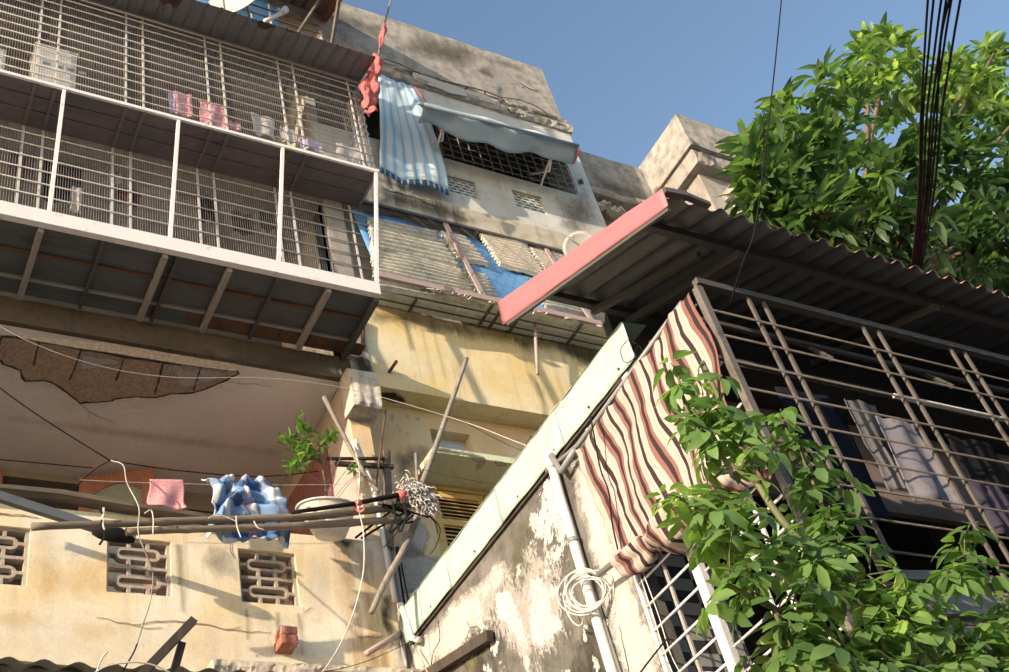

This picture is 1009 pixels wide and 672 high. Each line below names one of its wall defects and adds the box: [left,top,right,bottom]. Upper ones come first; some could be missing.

water stain [415,40,468,59]
flaking render [0,335,240,404]
peeling [470,479,568,672]
water stain [382,597,391,632]